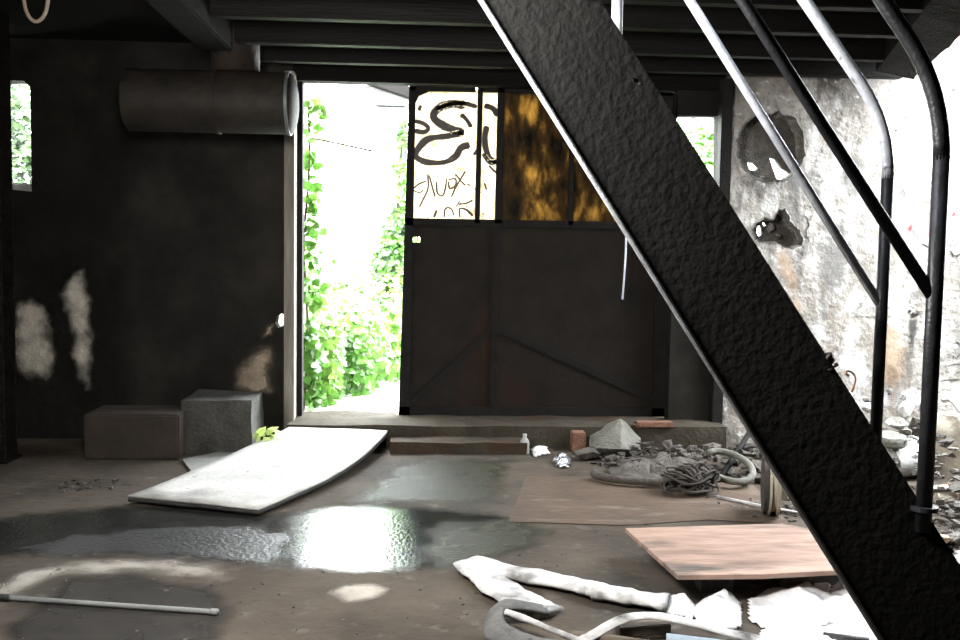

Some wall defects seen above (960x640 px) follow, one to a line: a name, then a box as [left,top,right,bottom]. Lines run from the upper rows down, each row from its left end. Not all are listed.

spalling [736,109,807,185]
spalling [752,207,805,249]